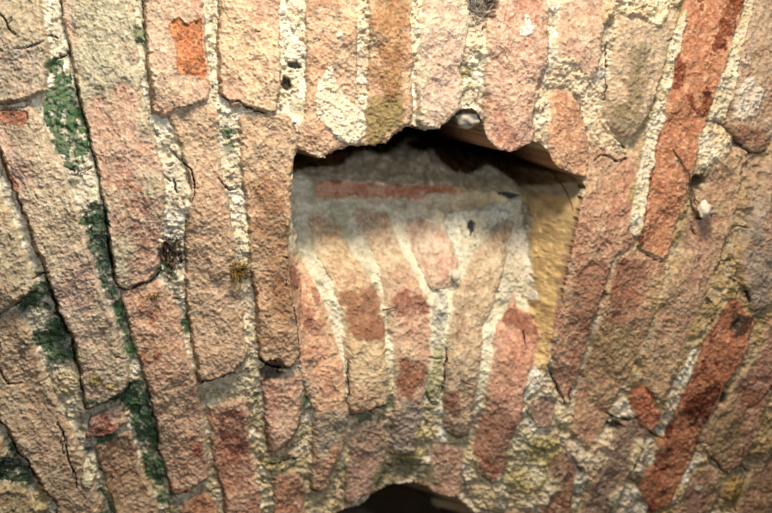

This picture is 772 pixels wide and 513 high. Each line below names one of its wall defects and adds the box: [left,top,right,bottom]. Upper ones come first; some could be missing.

spalling [455,112,481,129]
spalling [290,265,300,290]
spalling [391,290,430,317]
spalling [302,308,321,336]